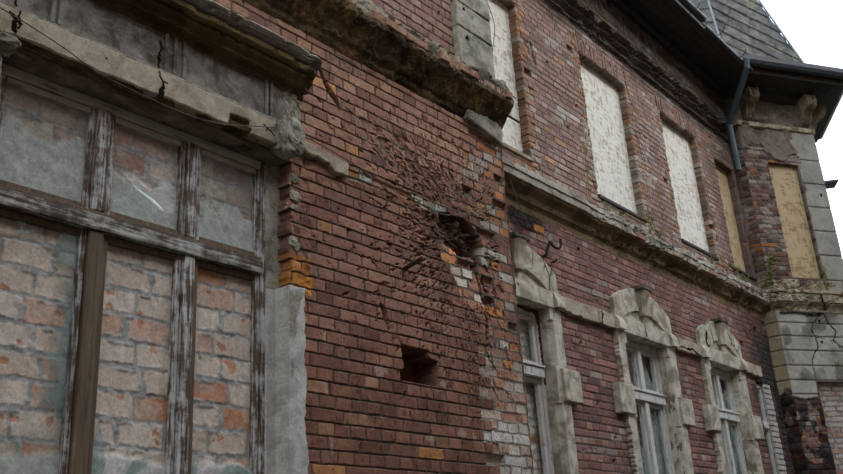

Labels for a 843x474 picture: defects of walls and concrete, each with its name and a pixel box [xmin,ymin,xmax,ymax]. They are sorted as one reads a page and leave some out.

flaking render [372,10,513,100]
crack [811,290,843,379]